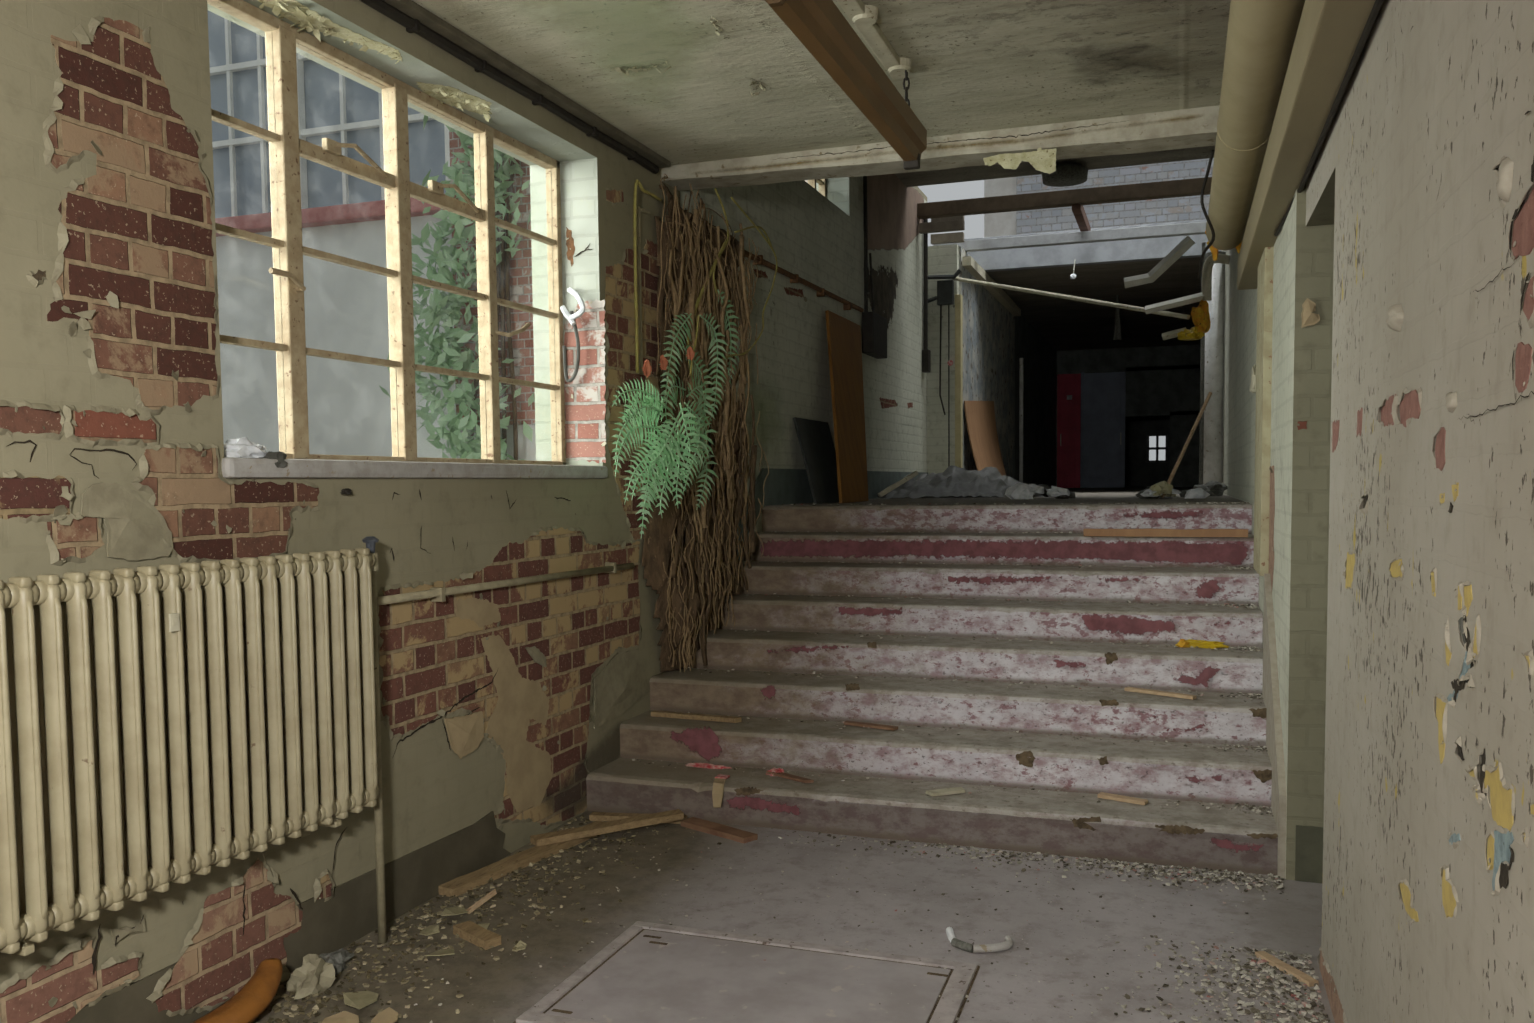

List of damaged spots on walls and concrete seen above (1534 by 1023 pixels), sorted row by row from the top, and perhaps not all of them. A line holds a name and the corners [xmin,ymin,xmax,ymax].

water stain [936,140,1018,149]
flaking render [1492,156,1534,264]
flaking render [0,13,320,566]
flaking render [1514,276,1534,393]
flaking render [1332,387,1422,452]
flaking render [377,239,665,830]
peeling [1430,567,1534,897]
flaking render [0,917,146,1023]
flaking render [146,850,335,1017]
peeling [1440,864,1459,919]